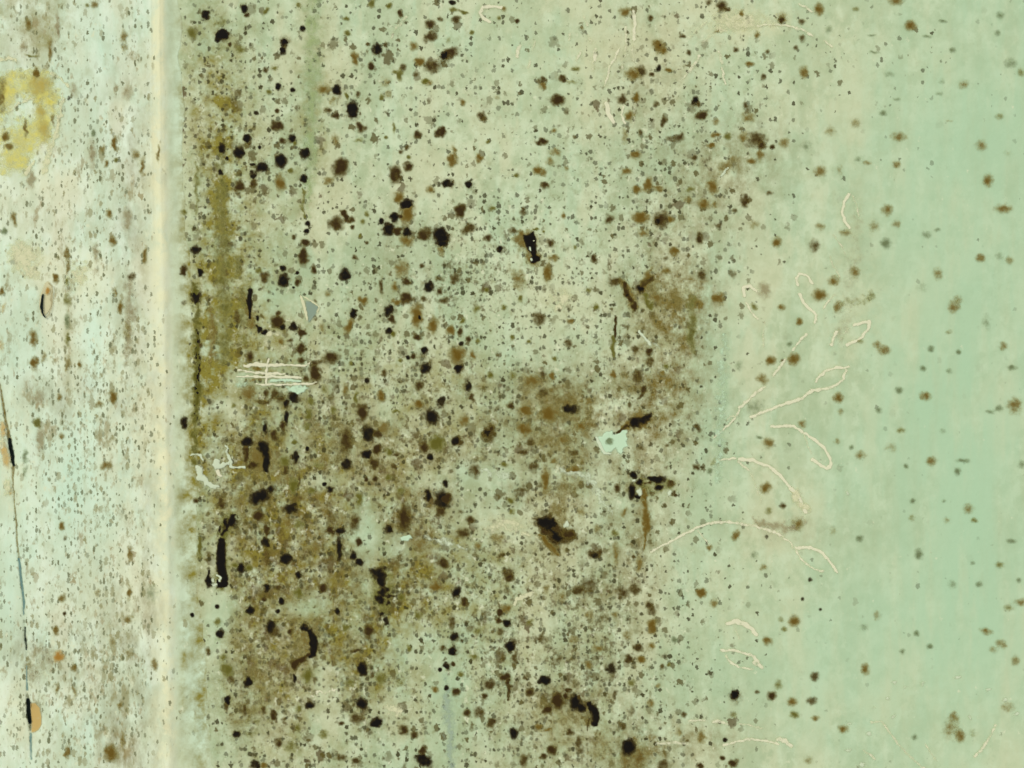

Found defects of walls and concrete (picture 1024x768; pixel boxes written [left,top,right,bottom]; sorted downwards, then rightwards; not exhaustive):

mould [180,0,318,465]
mould [497,227,545,267]
peeling [300,295,320,322]
peeling [286,385,308,394]
peeling [190,445,246,489]
mould [241,424,333,528]
peeling [595,430,628,454]
crack [0,386,32,760]
mould [205,514,252,591]
mould [533,504,576,556]
mould [629,471,678,550]
mould [537,676,600,731]